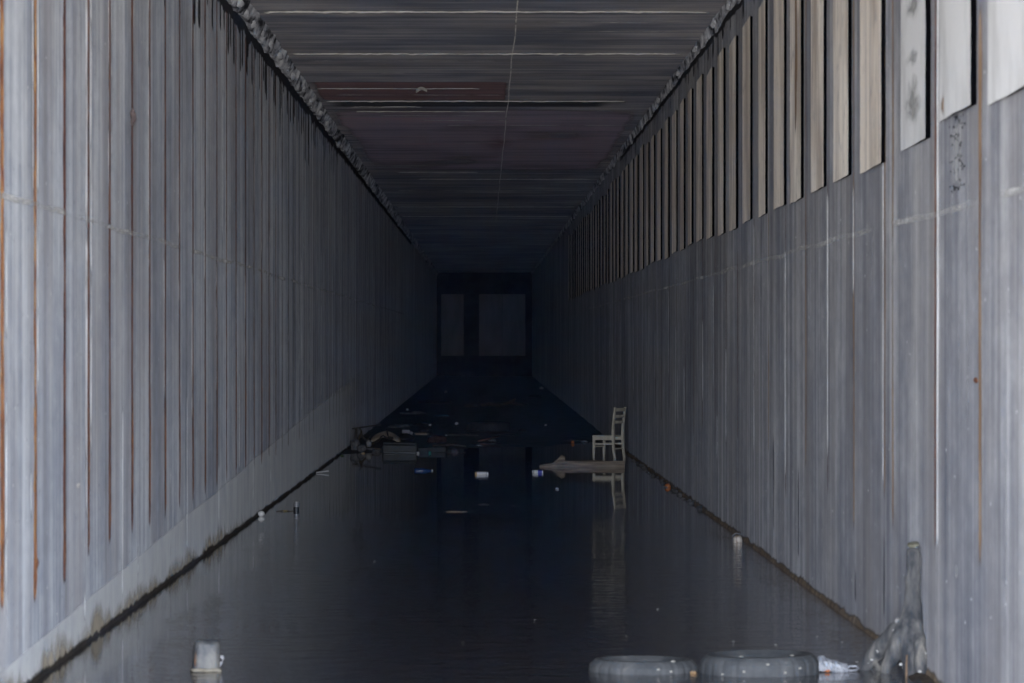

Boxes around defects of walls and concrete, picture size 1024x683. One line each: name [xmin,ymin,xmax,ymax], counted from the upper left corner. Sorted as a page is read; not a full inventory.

leakage [0,259,350,683]
crack [496,0,519,218]
rust [973,8,982,560]